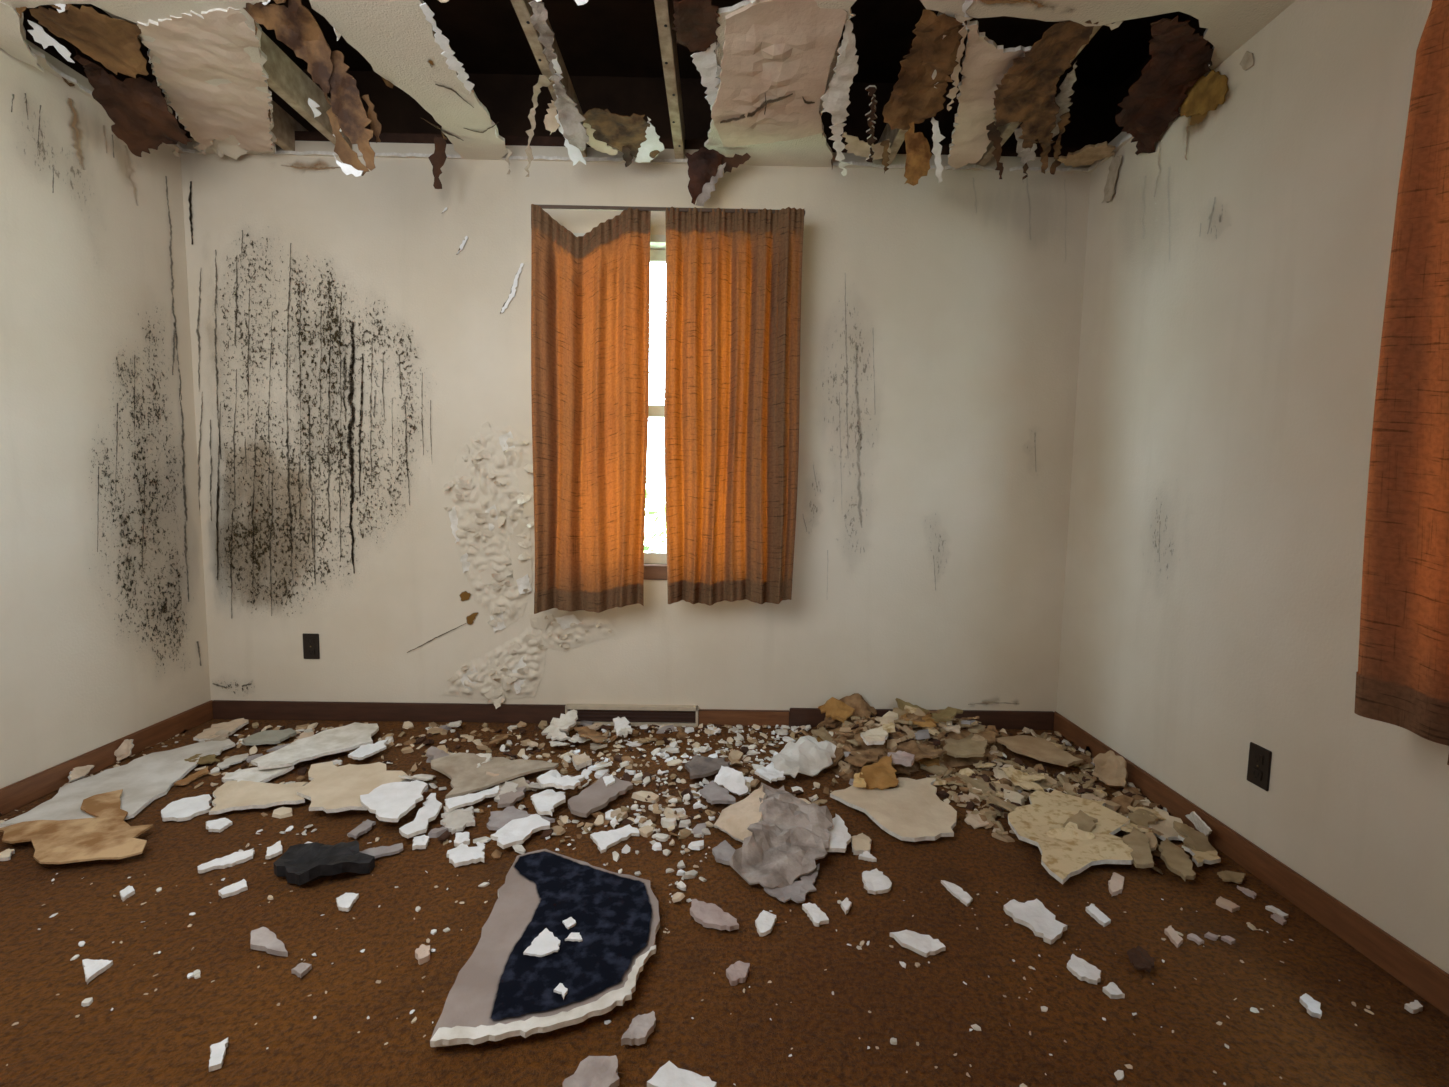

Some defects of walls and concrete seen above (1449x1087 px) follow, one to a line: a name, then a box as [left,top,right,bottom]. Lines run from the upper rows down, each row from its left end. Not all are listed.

mould [89,176,432,672]
leakage [822,305,873,467]